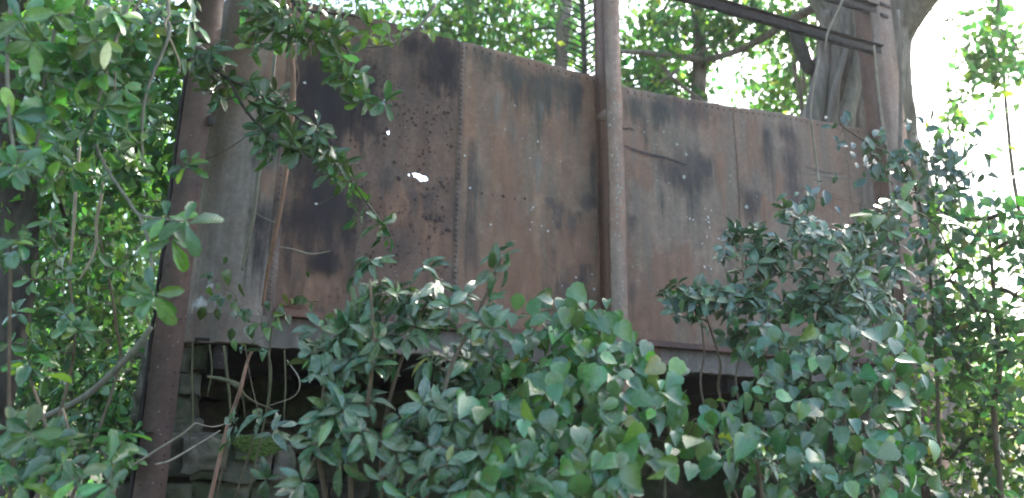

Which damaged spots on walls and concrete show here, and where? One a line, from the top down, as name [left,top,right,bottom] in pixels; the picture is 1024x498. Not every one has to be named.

spalling [344,55,458,275]